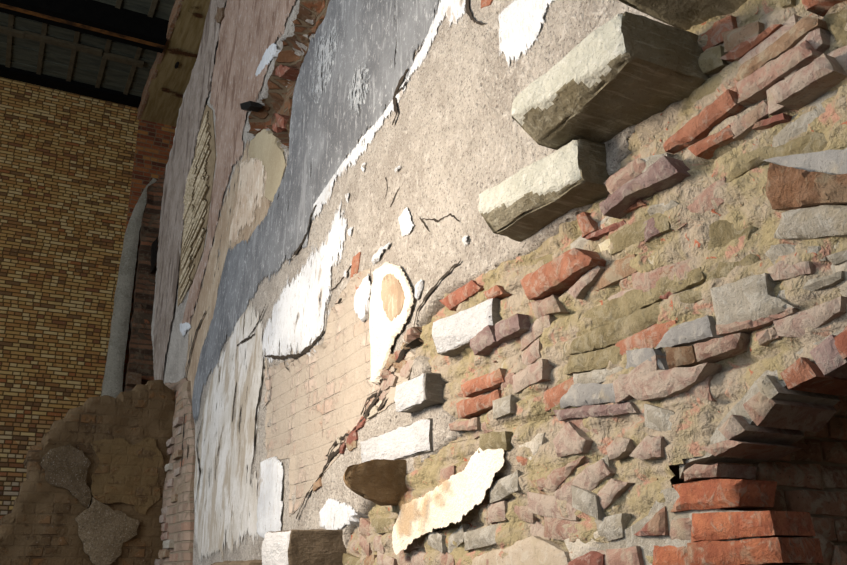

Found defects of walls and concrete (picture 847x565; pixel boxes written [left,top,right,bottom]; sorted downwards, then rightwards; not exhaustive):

peeling [255,43,281,76]
crack [419,213,460,232]
spalling [264,0,847,565]
peeling [180,322,191,337]
crack [296,260,461,519]
spalling [89,437,164,515]